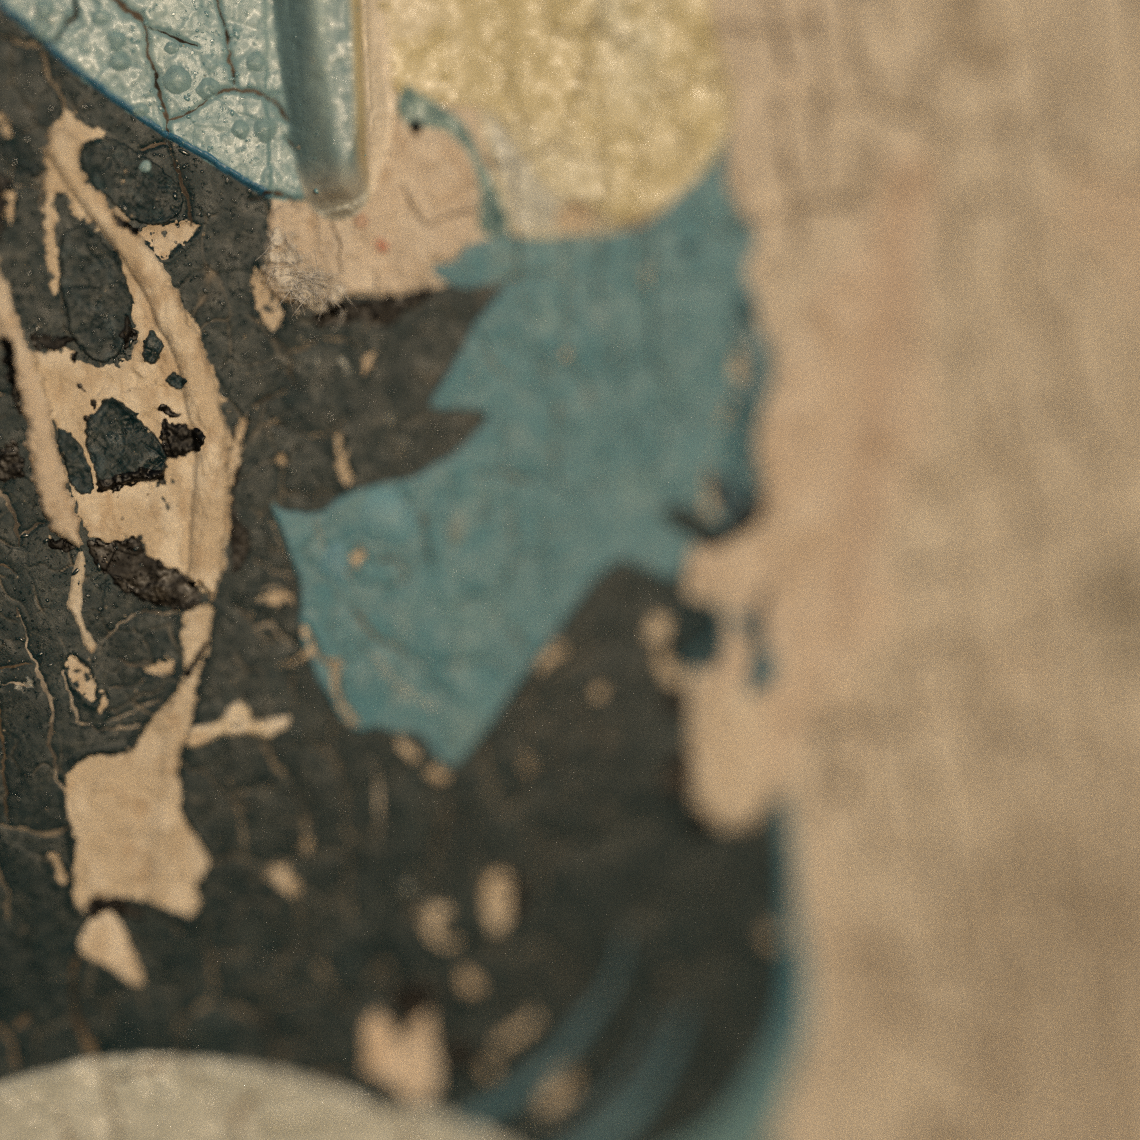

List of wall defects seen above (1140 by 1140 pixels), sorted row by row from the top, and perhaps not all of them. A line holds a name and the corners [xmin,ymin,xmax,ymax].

crack [0,0,79,117]
crack [113,0,300,227]
peeling [250,87,481,331]
crack [0,490,45,574]
peeling [0,109,293,985]
peeling [659,467,750,547]
peeling [644,597,778,698]
crack [0,608,179,837]
peeling [265,866,302,895]
peeling [484,869,513,933]
peeling [363,1011,440,1104]